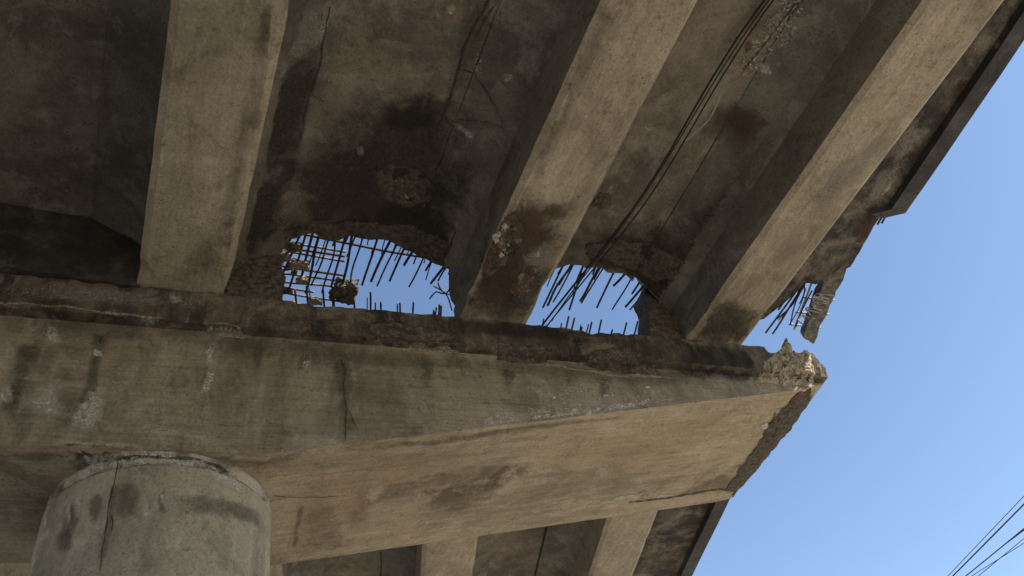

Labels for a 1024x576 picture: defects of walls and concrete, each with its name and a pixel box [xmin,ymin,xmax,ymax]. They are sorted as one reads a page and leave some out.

crack [435,0,504,144]
spalling [370,164,437,208]
spalling [282,210,456,310]
spalling [470,204,685,335]
crack [333,358,357,440]
spalling [725,283,835,496]
crack [100,462,118,568]
water stain [66,444,239,490]